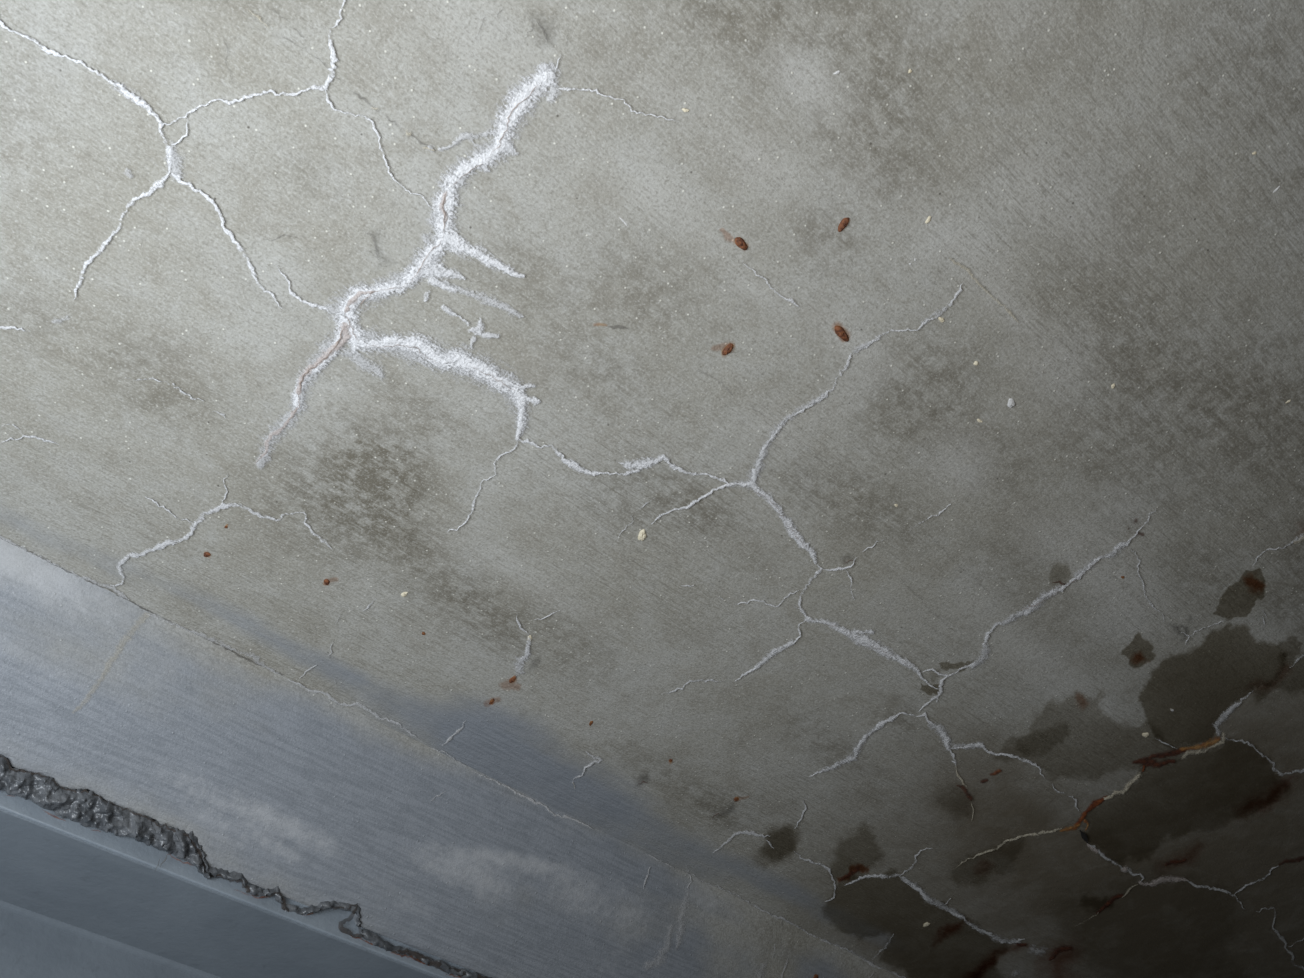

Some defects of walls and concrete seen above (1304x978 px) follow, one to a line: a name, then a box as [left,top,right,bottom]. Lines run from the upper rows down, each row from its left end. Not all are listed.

corrosion [735,237,748,250]
corrosion [838,217,850,232]
corrosion [834,326,849,342]
crack [0,0,1164,788]
crack [1253,534,1304,565]
crack [960,692,1304,918]
crack [713,800,1045,976]
crack [1256,907,1304,970]